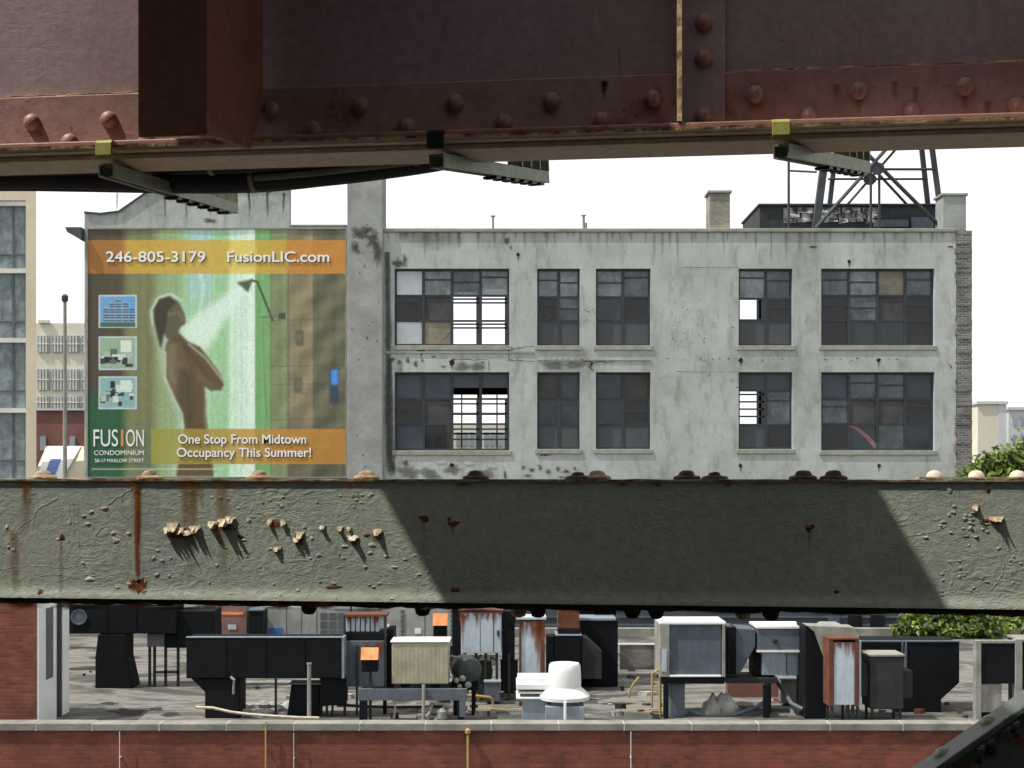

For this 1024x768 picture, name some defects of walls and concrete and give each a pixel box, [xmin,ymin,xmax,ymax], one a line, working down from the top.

leakage [352,224,394,472]
corrosion [126,483,148,608]
corrosion [312,604,383,612]
corrosion [454,609,502,630]